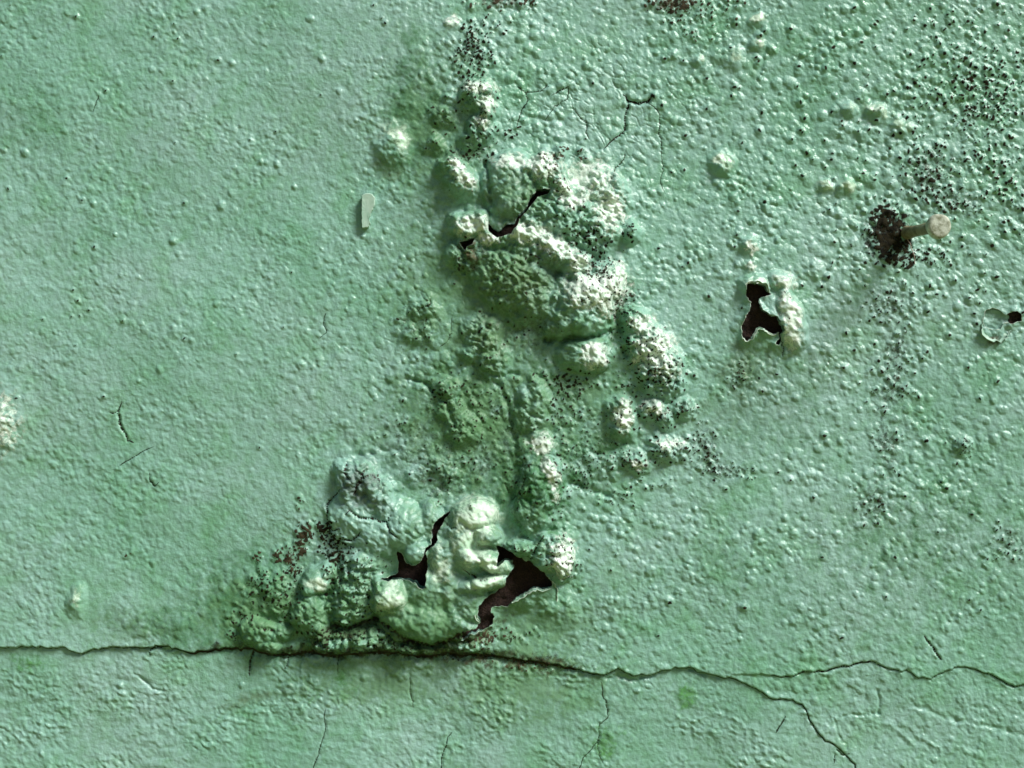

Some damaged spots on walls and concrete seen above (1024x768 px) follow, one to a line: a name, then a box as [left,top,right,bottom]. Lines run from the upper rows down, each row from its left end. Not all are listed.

peeling [741,280,784,345]
peeling [381,511,450,589]
peeling [461,545,558,641]
crack [7,617,1024,768]